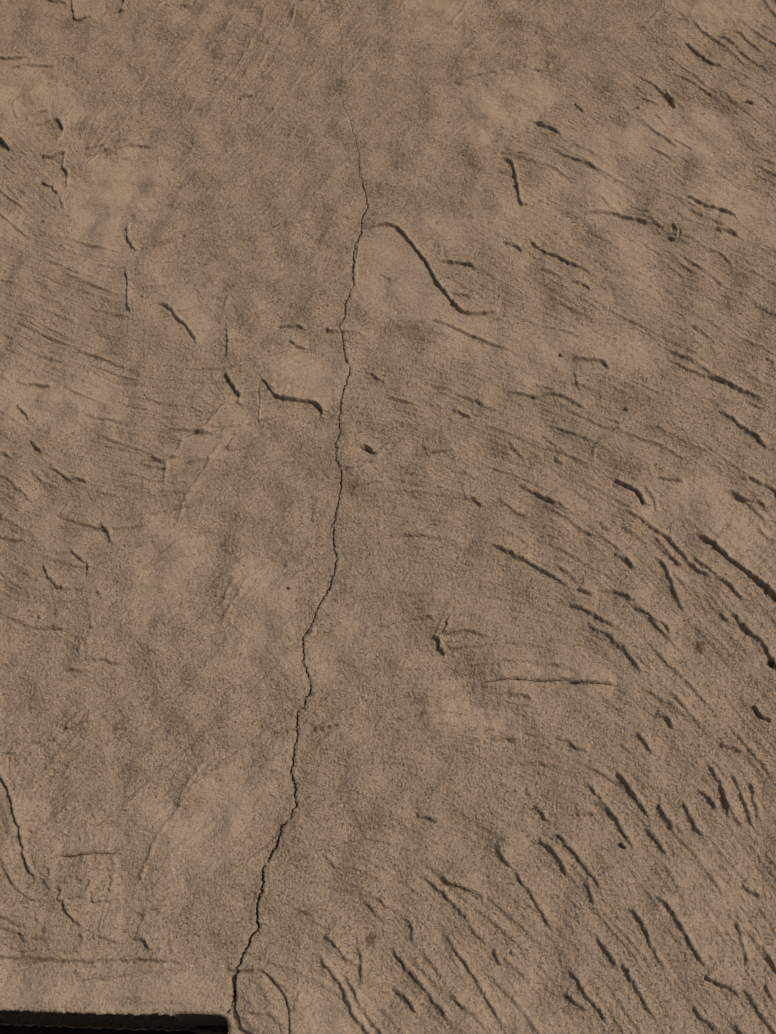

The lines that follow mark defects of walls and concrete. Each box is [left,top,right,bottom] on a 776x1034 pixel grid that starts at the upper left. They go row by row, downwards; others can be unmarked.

crack [227,7,368,1031]